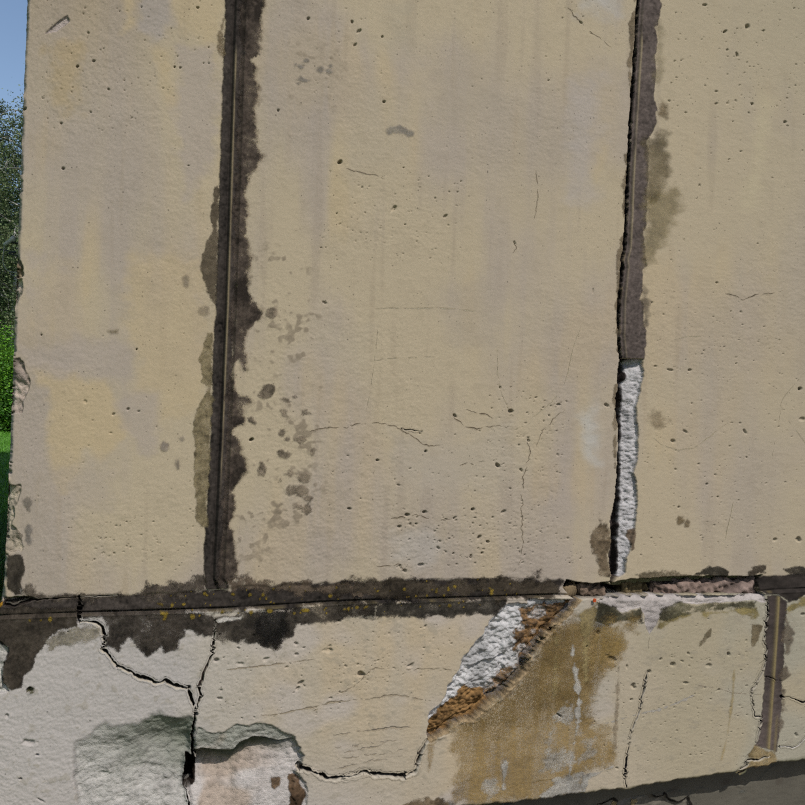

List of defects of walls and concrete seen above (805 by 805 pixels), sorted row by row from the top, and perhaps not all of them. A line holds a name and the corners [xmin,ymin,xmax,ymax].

damp [641,135,675,258]
damp [0,0,560,690]
spalling [608,359,643,581]
crack [6,593,312,754]
spalling [74,714,308,805]
crack [299,739,430,783]
spalling [426,597,582,742]
damp [539,602,644,799]
crack [597,671,649,805]
spalling [599,591,765,634]
damp [658,601,763,647]
crack [735,600,805,775]